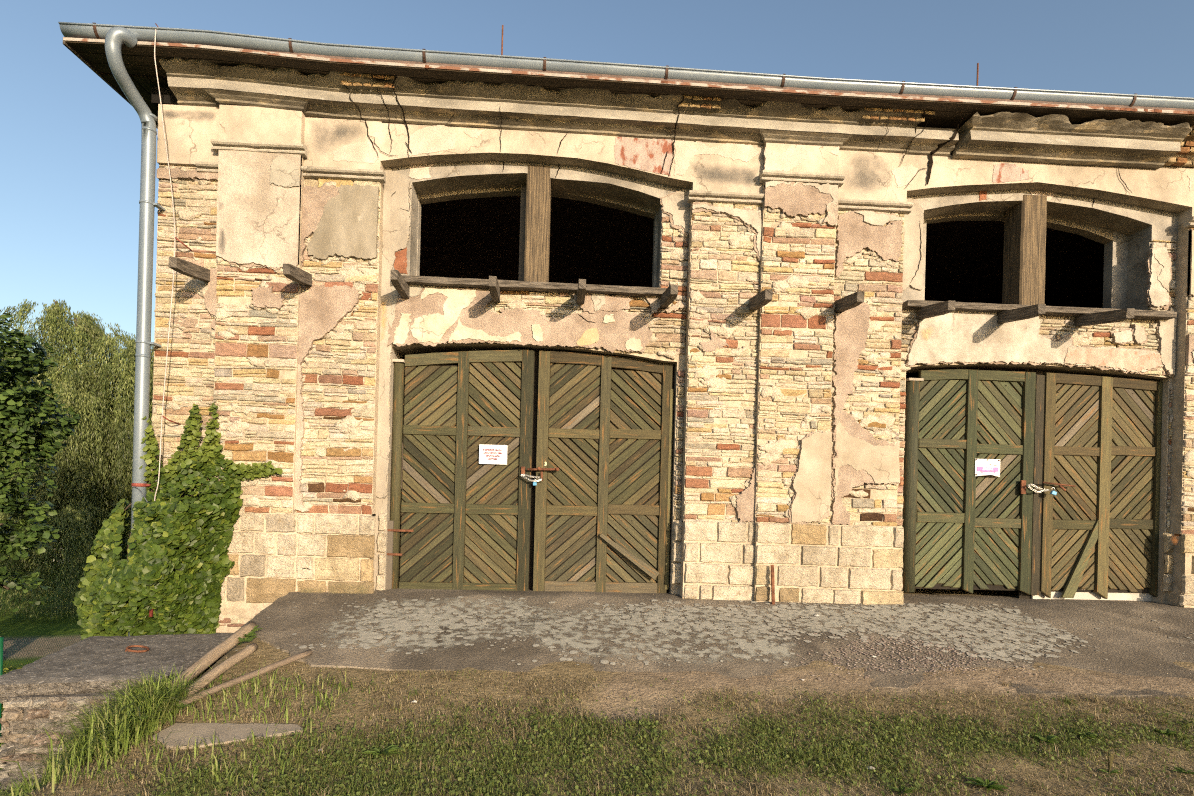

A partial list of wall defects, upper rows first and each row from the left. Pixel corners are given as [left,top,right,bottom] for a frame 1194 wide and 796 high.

peeling [156,150,379,330]
crack [340,77,412,211]
crack [661,96,684,174]
peeling [614,137,903,277]
crack [877,122,959,186]
spalling [979,163,1057,201]
spalling [1164,125,1194,190]
peeling [298,285,362,365]
peeling [387,248,685,354]
peeling [905,247,1194,376]
peeling [788,301,900,525]